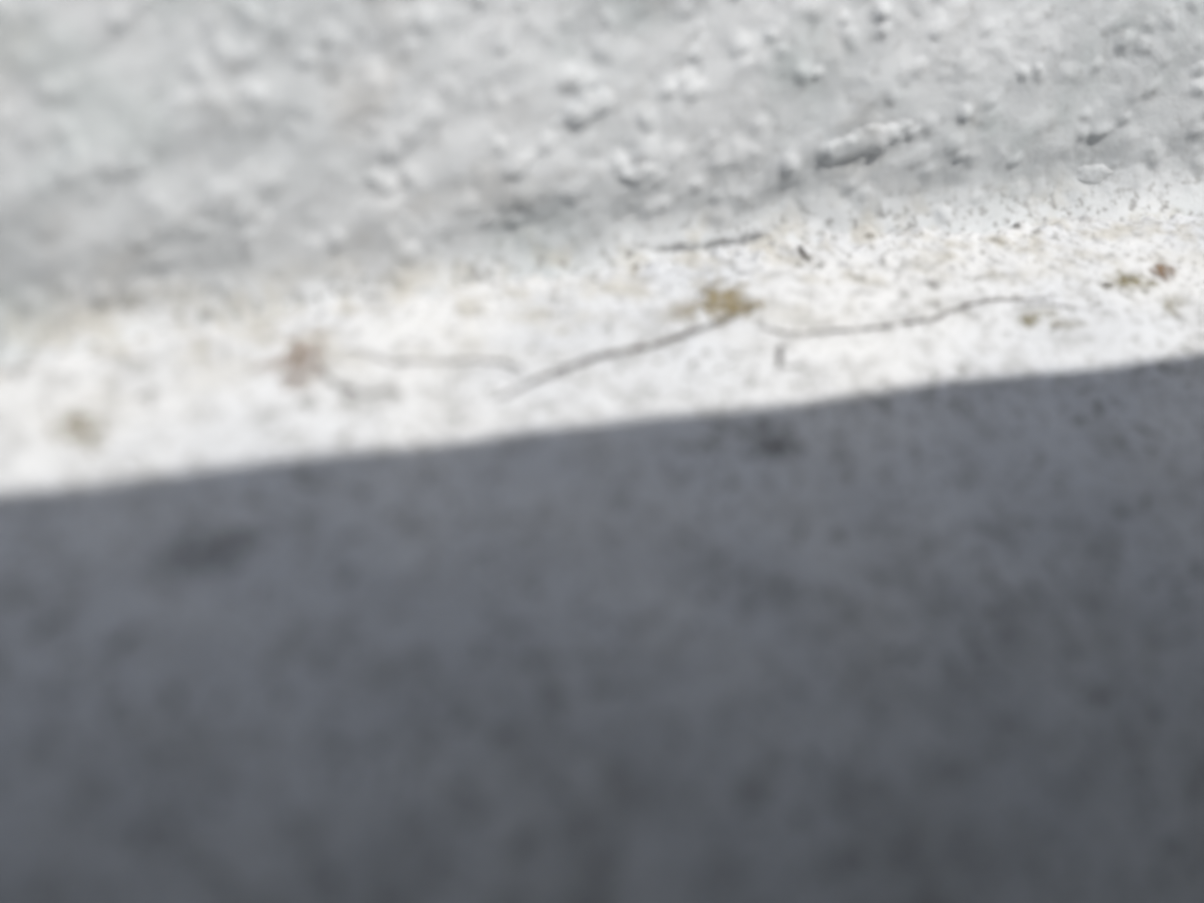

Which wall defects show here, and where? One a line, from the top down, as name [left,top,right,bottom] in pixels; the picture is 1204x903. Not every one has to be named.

crack [317,297,1079,399]